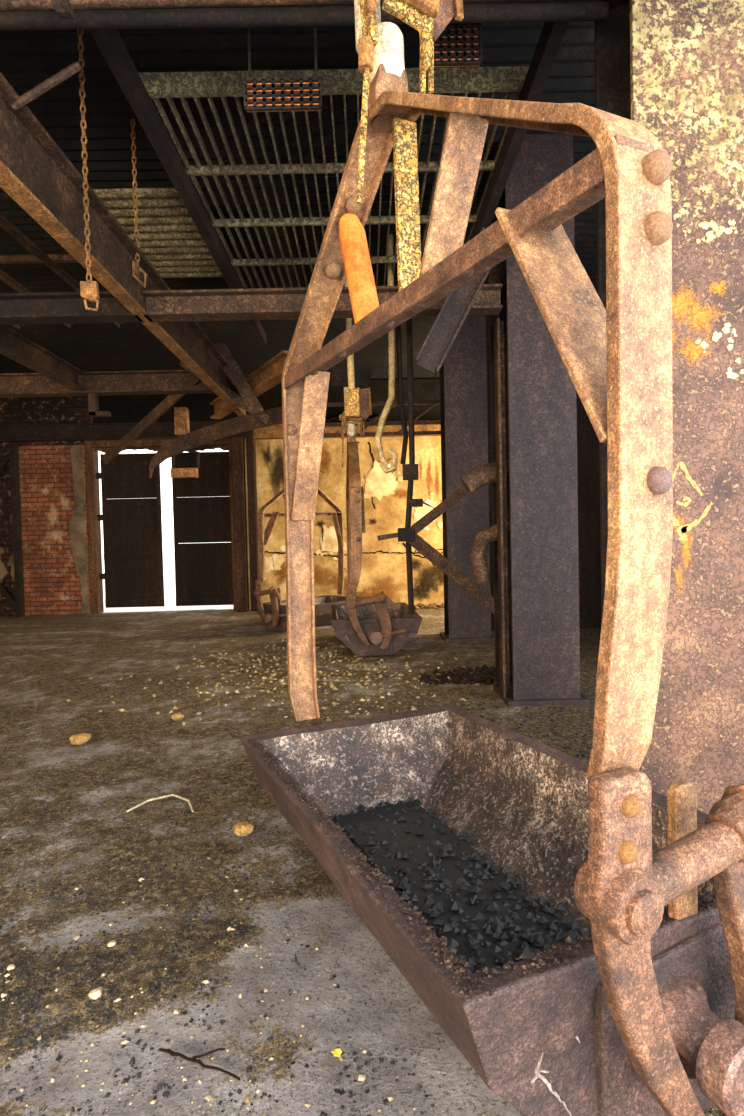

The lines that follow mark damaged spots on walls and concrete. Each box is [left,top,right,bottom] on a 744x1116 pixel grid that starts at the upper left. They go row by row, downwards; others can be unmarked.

rust [710,282,725,293]
rust [672,290,720,361]
damp [263,447,284,492]
damp [320,448,329,469]
rust [673,515,691,585]
peeling [0,547,14,601]
damp [276,565,286,583]
damp [314,569,399,599]
damp [412,560,444,600]